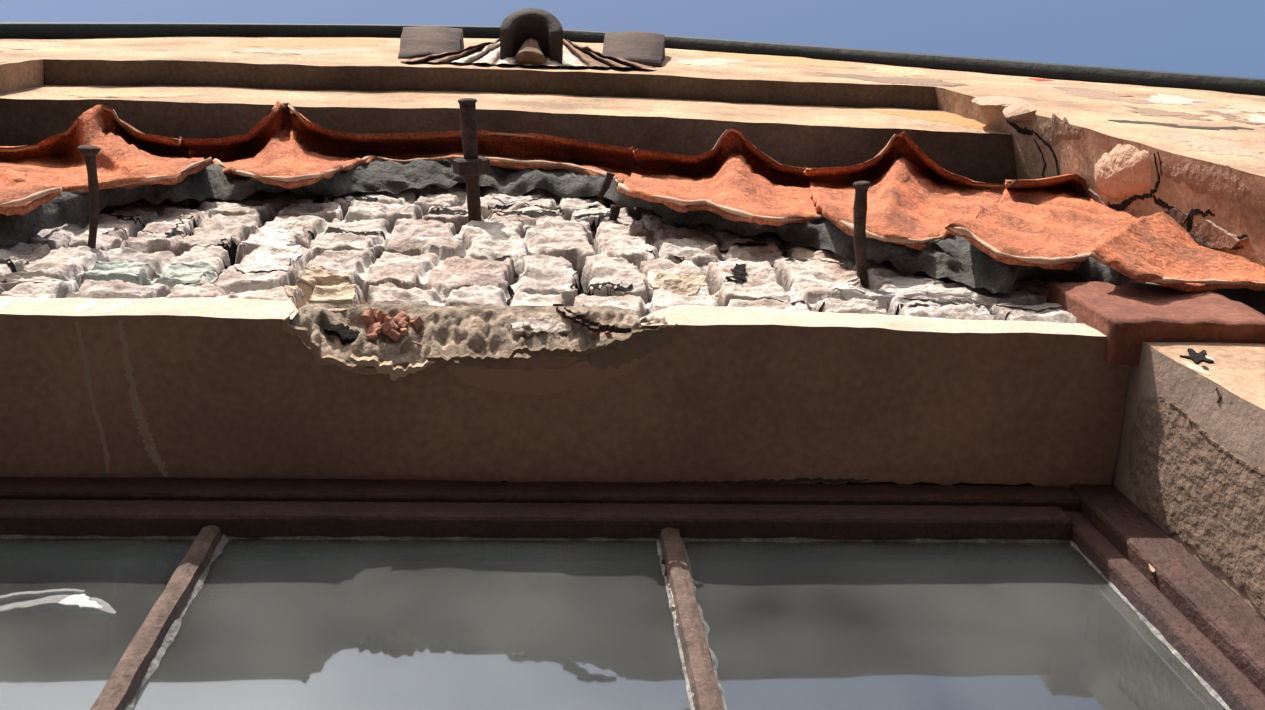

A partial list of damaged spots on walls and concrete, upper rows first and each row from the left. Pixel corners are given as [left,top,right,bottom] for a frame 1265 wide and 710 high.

crack [1007,120,1060,178]
crack [1105,120,1254,250]
flaking render [0,155,1261,381]